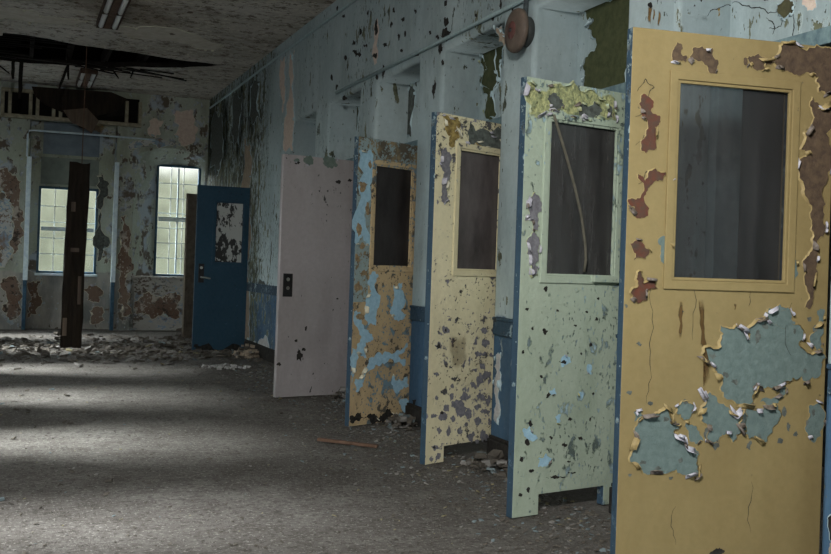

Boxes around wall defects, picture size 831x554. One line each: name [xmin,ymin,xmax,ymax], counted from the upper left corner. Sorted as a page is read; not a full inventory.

spalling [0,33,139,62]
peeling [523,0,630,123]
peeling [0,276,43,324]
peeling [93,174,181,320]
peeling [335,150,408,392]
peeling [625,40,831,481]
peeling [391,374,416,414]